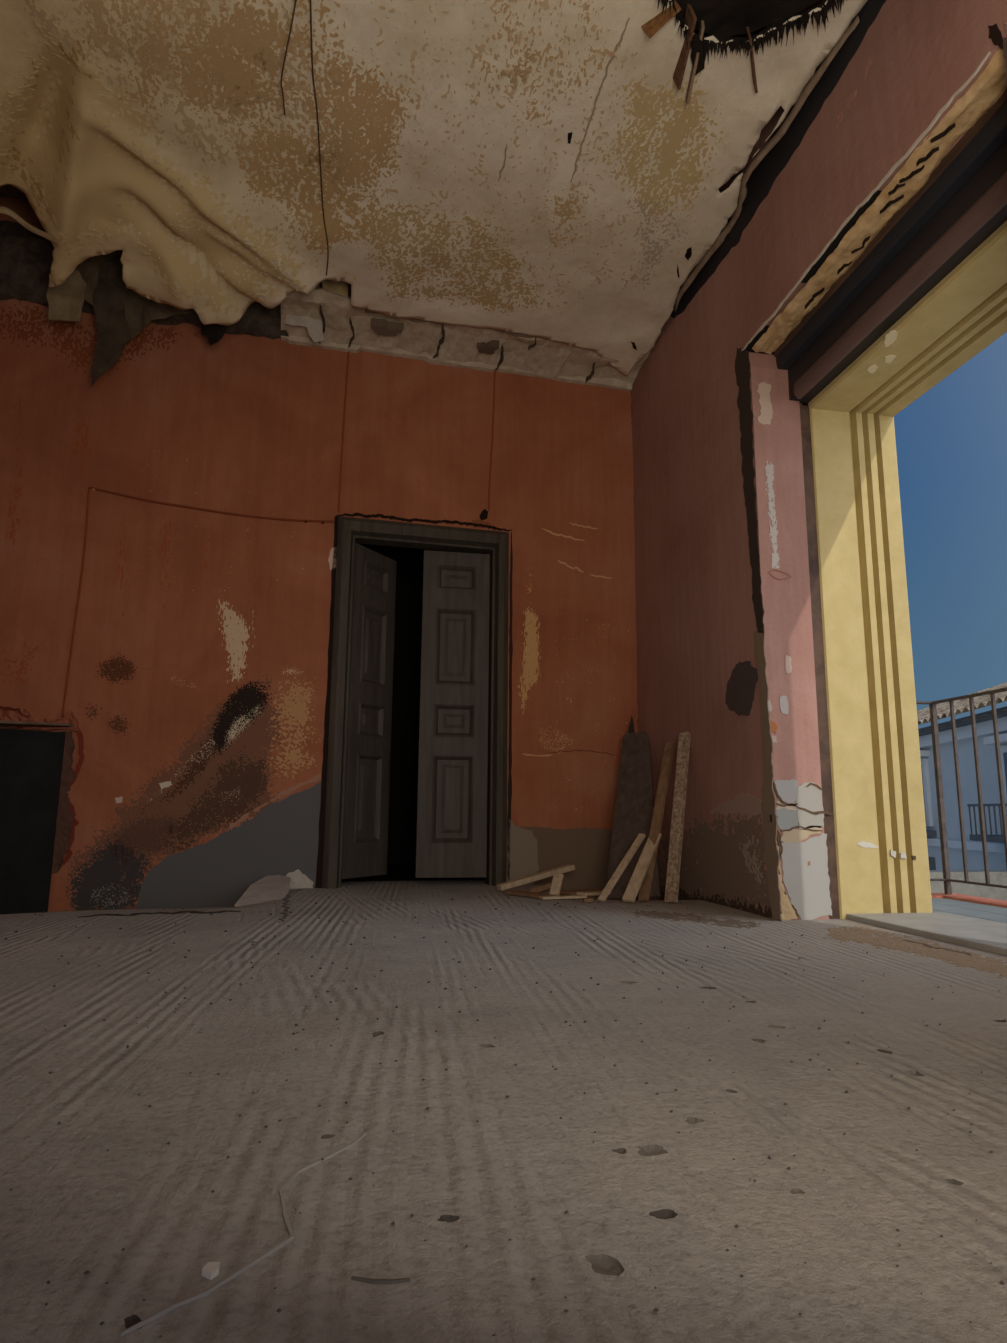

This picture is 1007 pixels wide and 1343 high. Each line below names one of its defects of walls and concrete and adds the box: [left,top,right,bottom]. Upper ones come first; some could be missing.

spalling [988,23,1007,83]
water stain [0,0,731,338]
water stain [0,302,98,377]
crack [319,305,445,359]
crack [492,329,549,371]
water stain [94,653,172,684]
peeling [218,599,256,683]
peeling [517,567,542,714]
spalling [725,348,832,921]
water stain [150,706,263,801]
spalling [286,869,314,889]